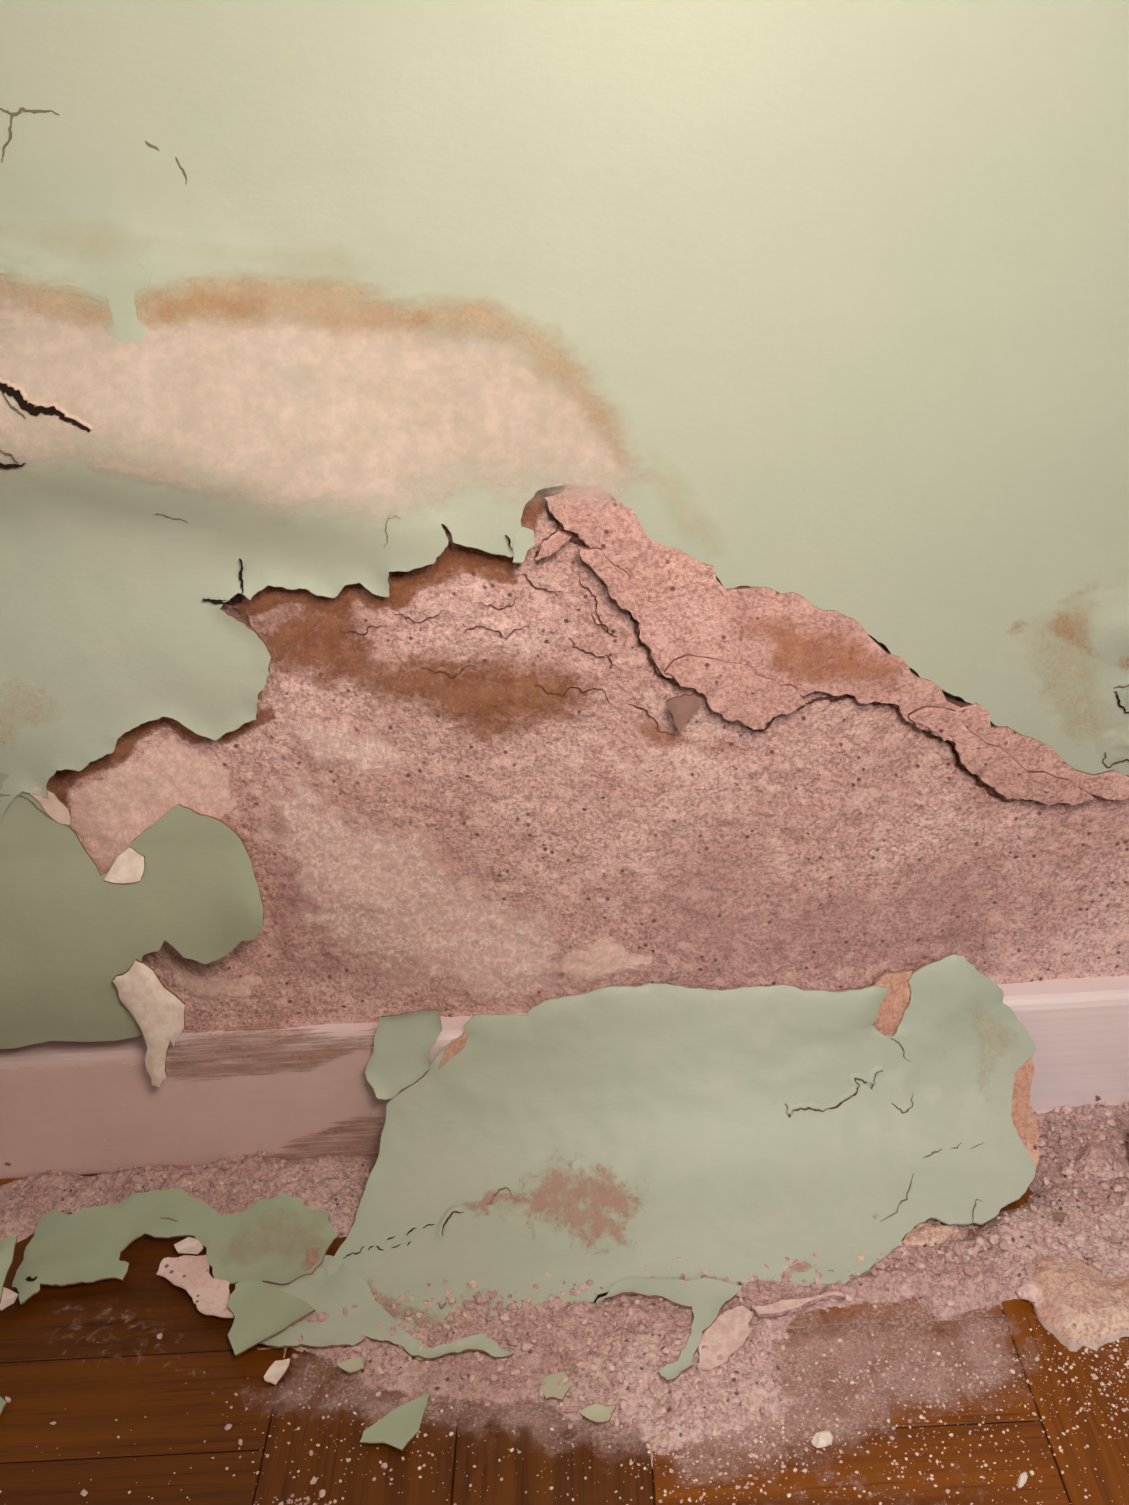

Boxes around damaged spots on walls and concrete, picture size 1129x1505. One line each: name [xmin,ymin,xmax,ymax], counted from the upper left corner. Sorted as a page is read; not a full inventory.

crack [0,107,59,163]
crack [0,377,94,433]
leakage [0,279,630,530]
crack [0,450,26,469]
leakage [237,542,584,739]
crack [1114,684,1129,713]
spalling [0,483,1129,1087]
crack [785,1038,914,1118]
peeling [174,1237,203,1254]
peeling [0,1287,18,1311]
peeling [227,1281,315,1356]
peeling [264,1358,290,1385]